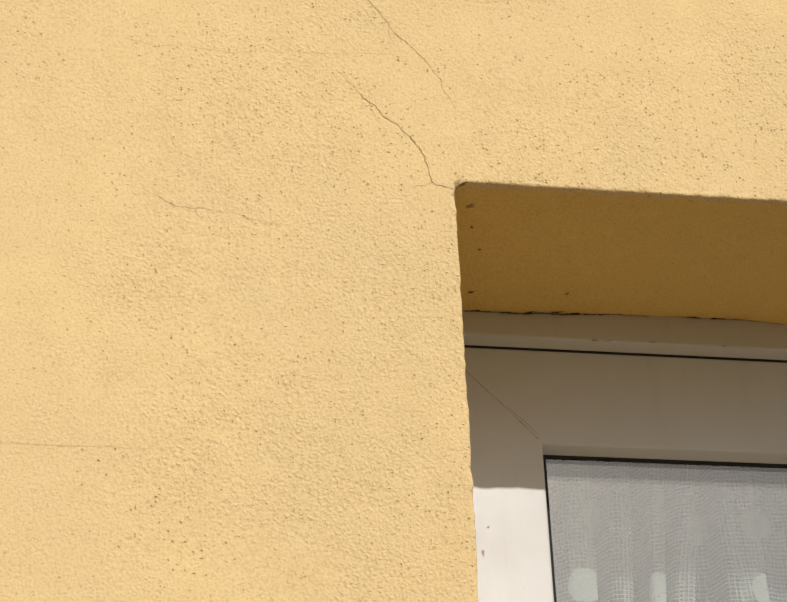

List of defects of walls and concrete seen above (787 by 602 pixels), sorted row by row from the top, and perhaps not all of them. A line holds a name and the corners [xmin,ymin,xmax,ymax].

crack [361,94,456,190]